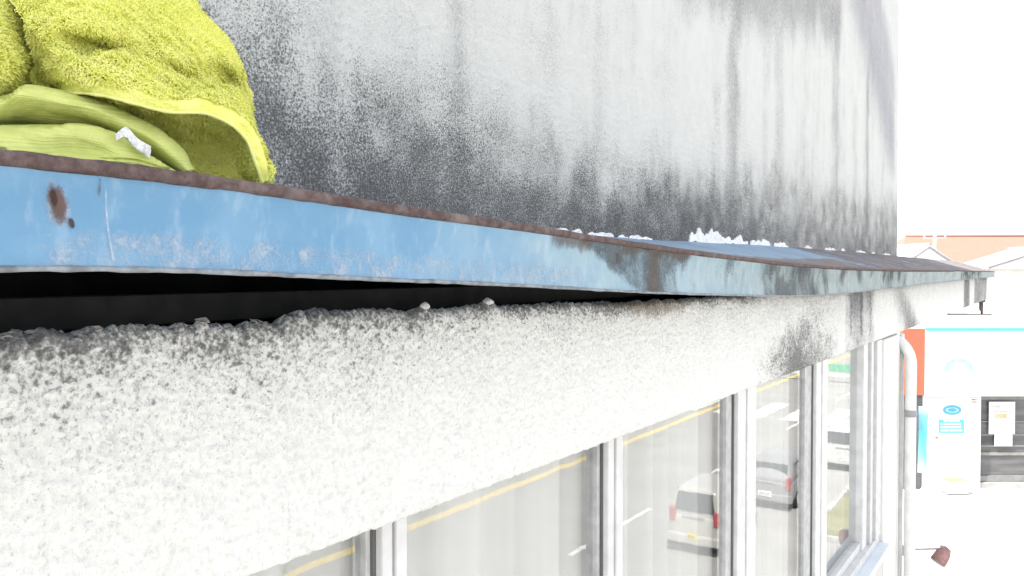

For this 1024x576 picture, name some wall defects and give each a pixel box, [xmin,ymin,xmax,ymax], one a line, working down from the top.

water stain [199,0,897,255]
rust [48,187,75,228]
water stain [763,319,835,380]